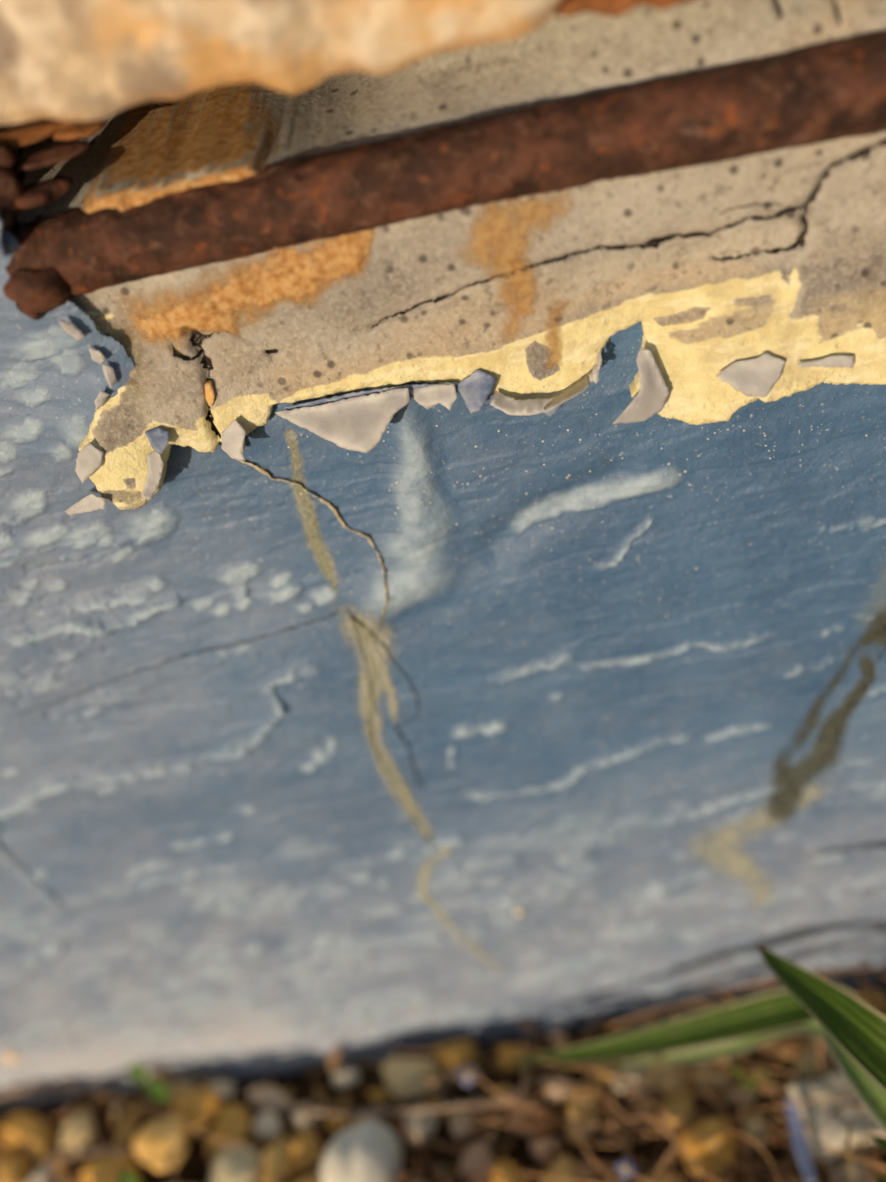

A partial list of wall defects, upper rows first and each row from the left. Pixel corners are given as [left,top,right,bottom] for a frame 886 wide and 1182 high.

spalling [0,0,886,259]
rust [0,30,886,342]
spalling [58,131,886,516]
rust [547,307,563,367]
rust [554,0,691,17]
crack [371,139,886,329]
crack [20,328,433,849]
damp [286,431,337,584]
damp [342,610,500,974]
damp [695,611,886,907]